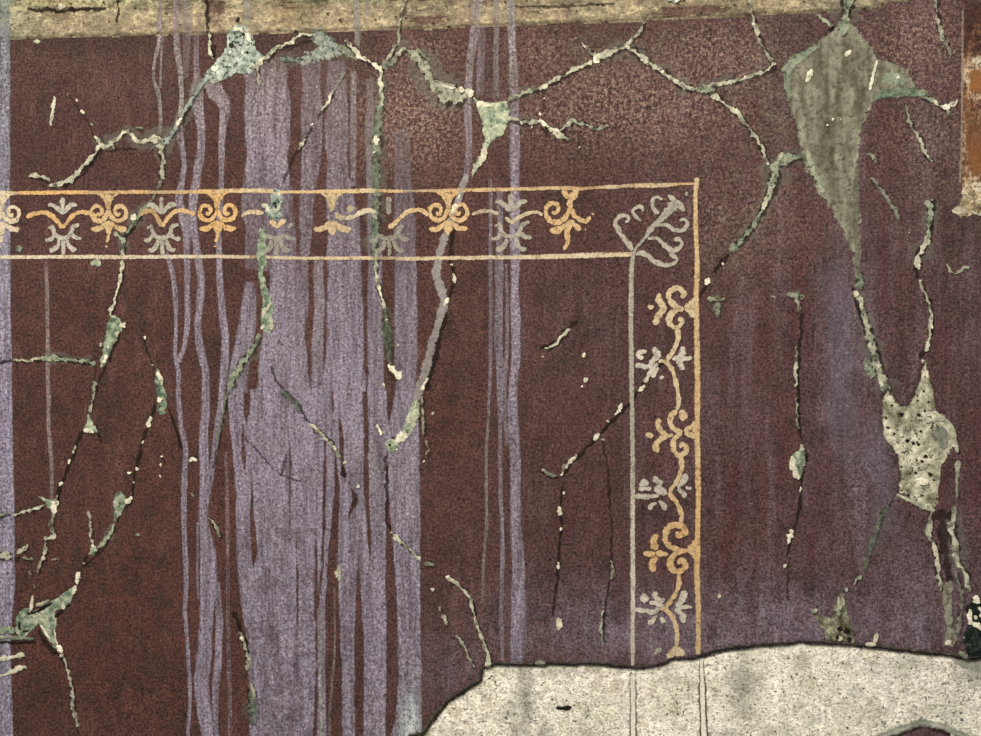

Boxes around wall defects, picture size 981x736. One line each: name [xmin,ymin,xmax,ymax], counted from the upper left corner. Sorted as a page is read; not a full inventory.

damp [0,0,15,736]
crack [0,346,109,589]
crack [28,0,213,316]
damp [152,0,422,736]
crack [253,0,474,462]
damp [463,0,525,662]
crack [508,0,810,310]
flaking render [789,444,809,483]
flaking render [781,20,928,276]
crack [866,153,936,363]
flaking render [881,362,961,512]
flaking render [407,580,981,736]